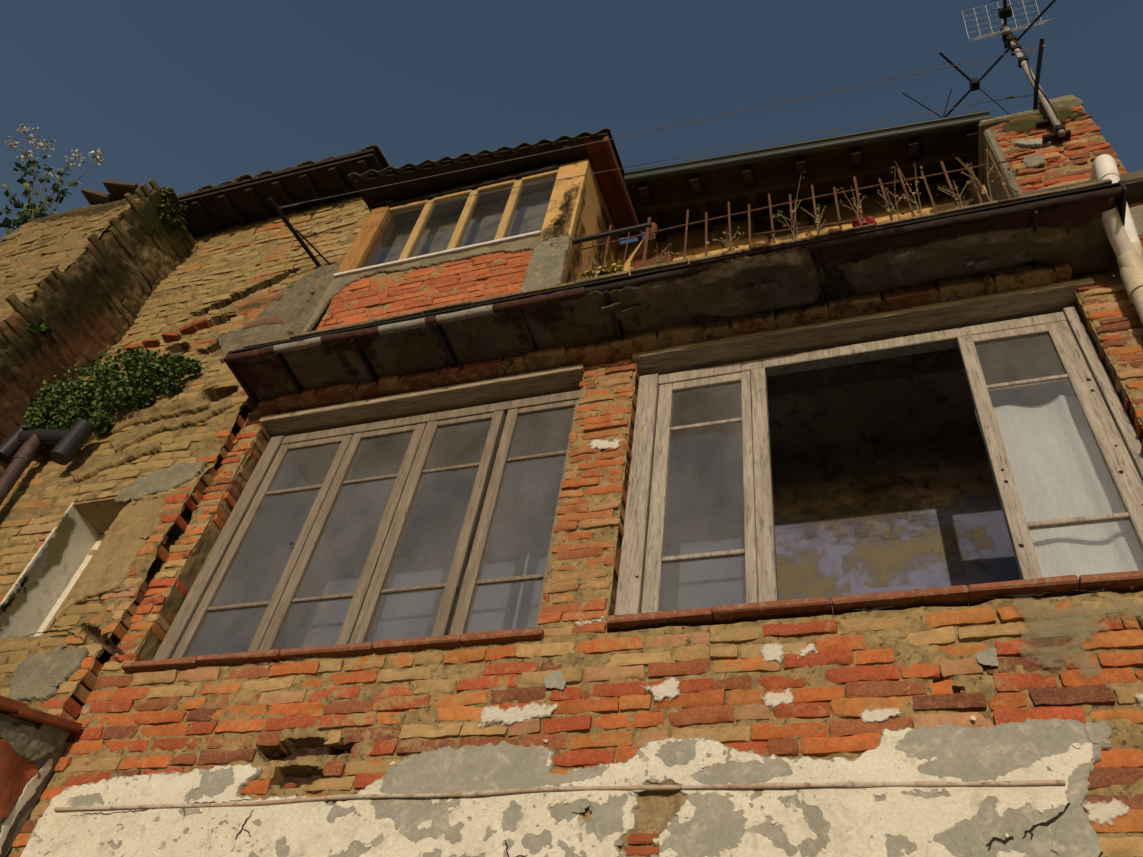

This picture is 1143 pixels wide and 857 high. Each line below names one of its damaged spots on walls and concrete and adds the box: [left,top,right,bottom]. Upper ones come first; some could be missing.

water stain [540,184,615,283]
crack [22,588,131,641]
spalling [265,746,351,762]
peeling [67,793,104,807]
peeling [178,766,234,834]
spalling [279,773,324,789]
peeling [327,739,830,857]
peeling [872,716,1110,857]
peeling [107,824,124,854]
peeling [275,836,291,857]
crack [986,803,1070,850]